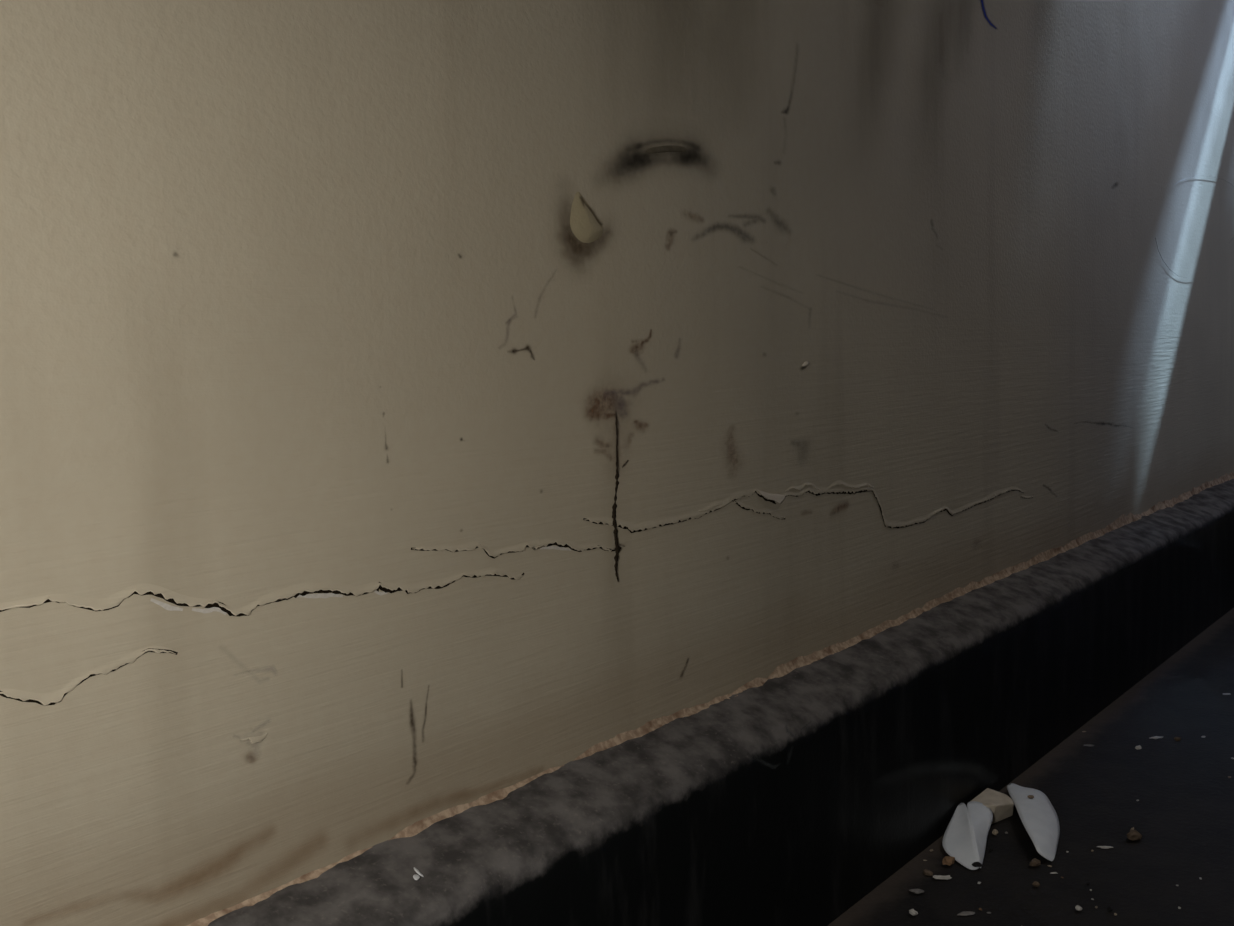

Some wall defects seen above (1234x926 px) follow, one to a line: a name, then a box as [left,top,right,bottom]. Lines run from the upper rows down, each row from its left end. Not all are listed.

crack [0,414,1033,617]
crack [0,646,178,706]